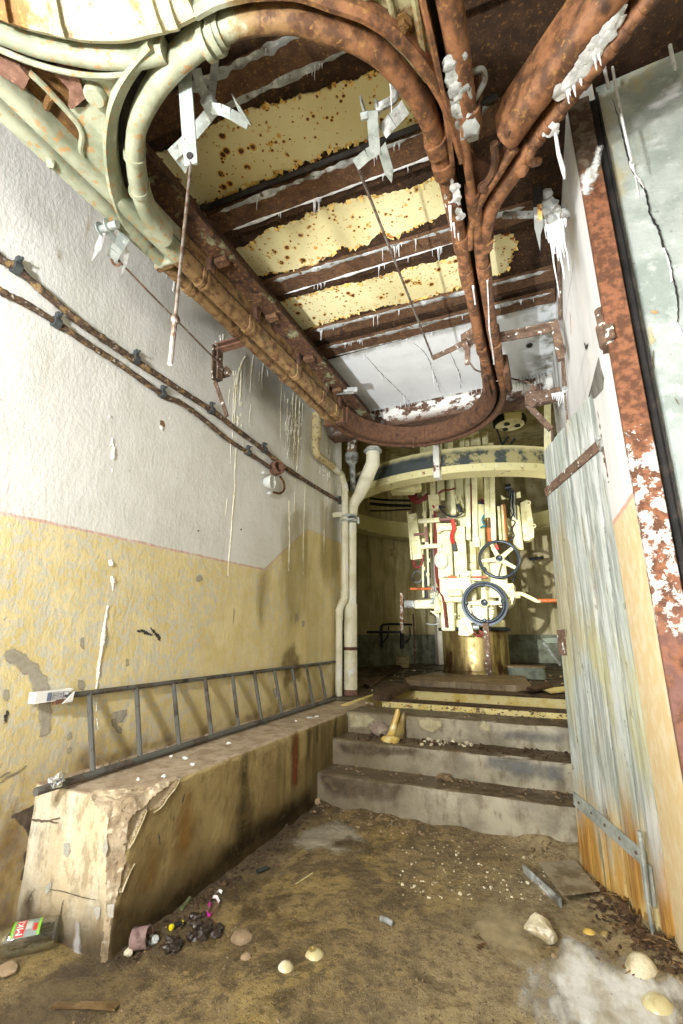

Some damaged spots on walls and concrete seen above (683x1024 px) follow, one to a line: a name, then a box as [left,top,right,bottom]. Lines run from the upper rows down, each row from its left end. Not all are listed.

crack [612,99,683,336]
leakage [225,355,268,575]
leakage [280,383,303,480]
leakage [288,494,305,572]
spalling [87,778,180,963]
leakage [150,760,310,923]
leakage [295,822,361,852]